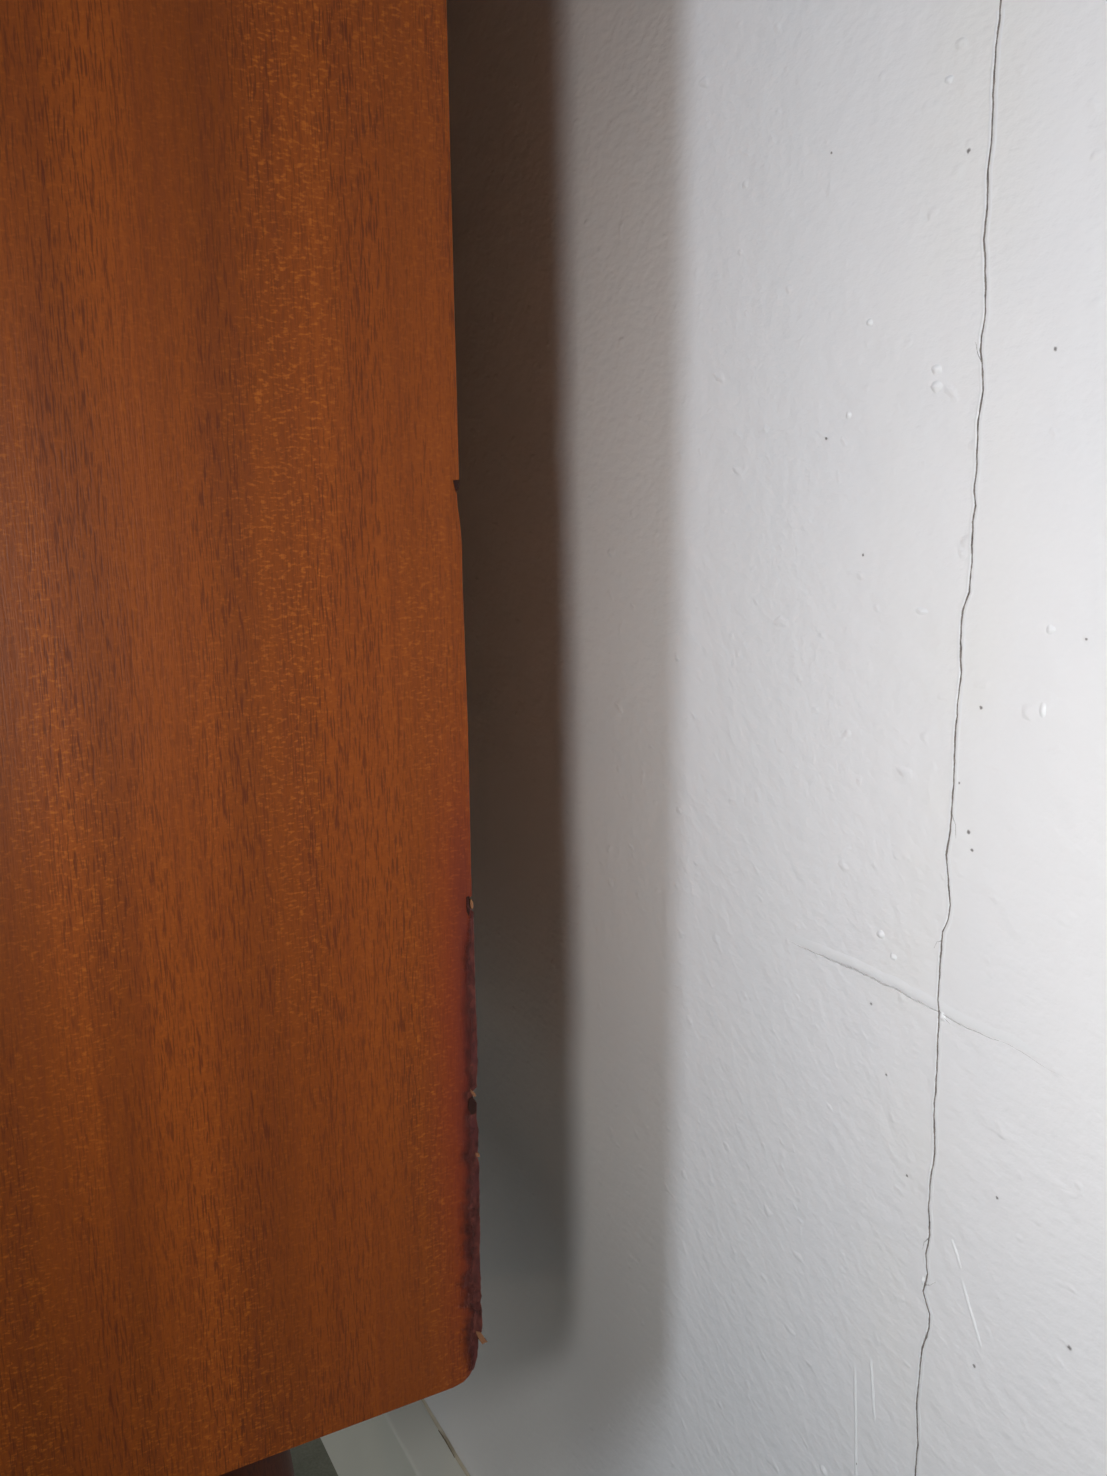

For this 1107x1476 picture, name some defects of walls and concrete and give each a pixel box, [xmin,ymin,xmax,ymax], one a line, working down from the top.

crack [912,0,1005,1476]